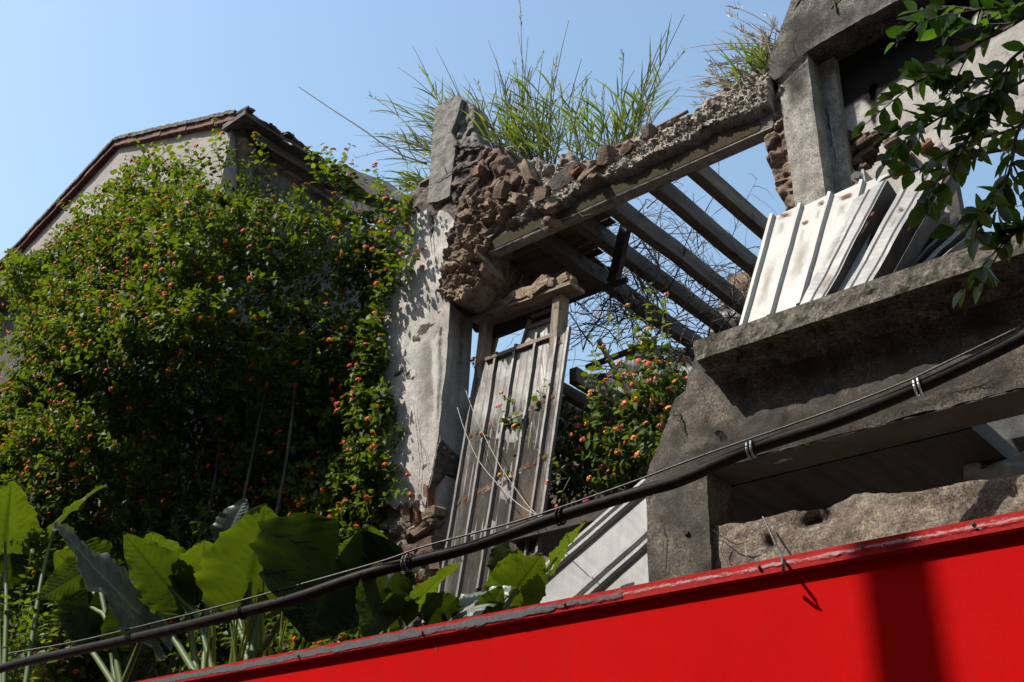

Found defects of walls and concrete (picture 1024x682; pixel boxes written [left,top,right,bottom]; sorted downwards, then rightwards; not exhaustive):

flaking render [830,123,891,172]
flaking render [400,440,460,593]
peeling [806,517,1024,559]